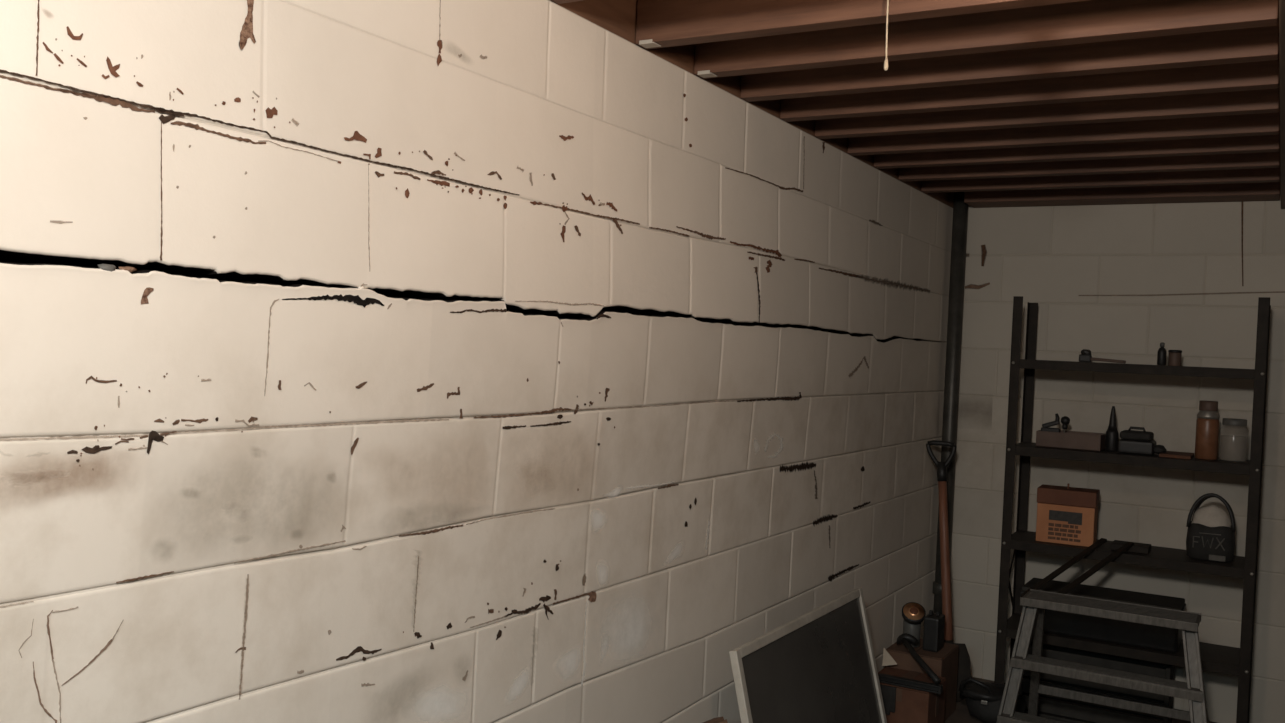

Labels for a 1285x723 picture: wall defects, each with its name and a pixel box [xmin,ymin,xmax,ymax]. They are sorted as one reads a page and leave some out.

crack [0,0,930,389]
crack [0,392,802,441]
crack [399,508,555,537]
crack [234,541,366,564]
crack [116,571,174,583]
crack [470,593,588,628]
crack [0,601,123,723]